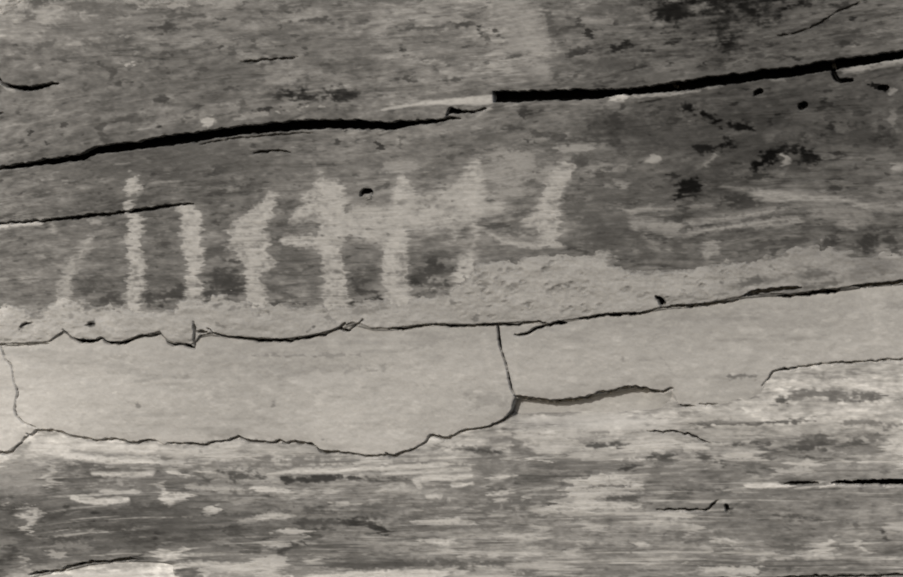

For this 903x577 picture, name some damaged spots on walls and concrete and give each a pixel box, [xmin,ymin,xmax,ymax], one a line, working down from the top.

crack [0,51,903,170]
leakage [531,0,850,218]
crack [0,203,190,224]
leakage [547,177,656,273]
crack [782,289,837,297]
crack [75,323,194,348]
crack [224,325,357,342]
crack [397,312,643,390]
crack [654,430,705,442]
peeling [875,424,903,470]
peeling [25,410,874,577]
crack [788,478,903,486]